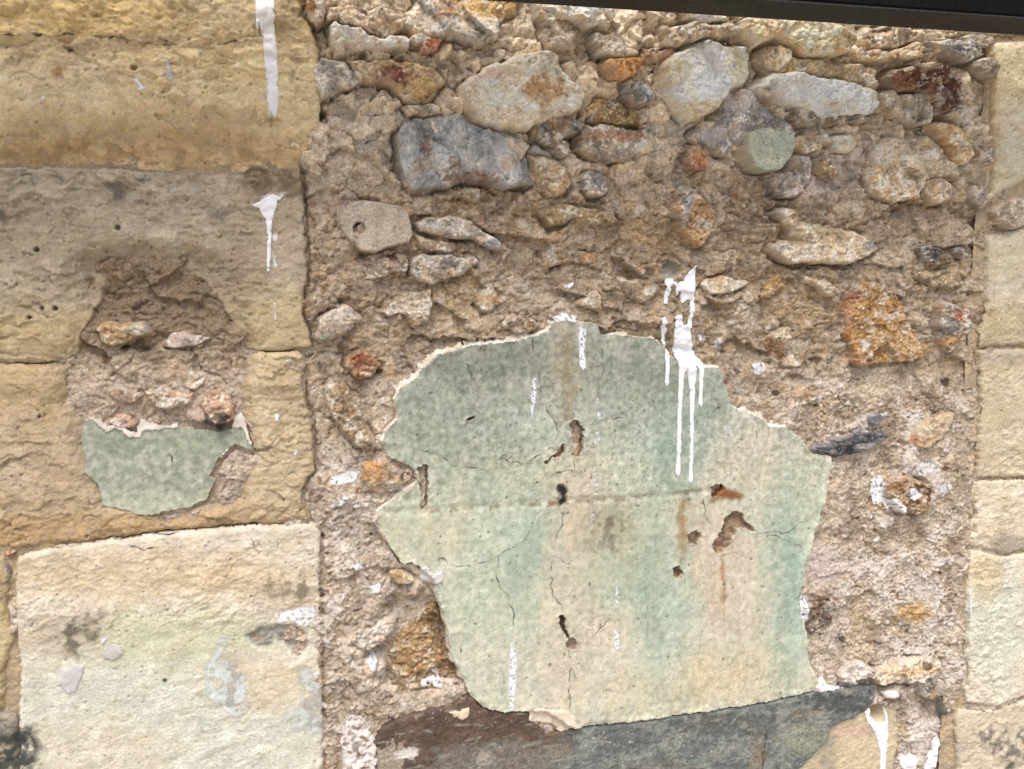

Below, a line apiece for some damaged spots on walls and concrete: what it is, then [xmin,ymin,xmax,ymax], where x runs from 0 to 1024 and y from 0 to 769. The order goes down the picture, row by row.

crack [423,338,590,483]
spalling [544,420,584,463]
spalling [416,464,428,509]
spalling [687,530,701,545]
spalling [712,511,754,554]
flaking render [419,566,445,585]
spalling [558,615,577,650]
flaking render [814,676,843,692]
flaking render [449,708,470,720]
flaking render [529,708,577,731]